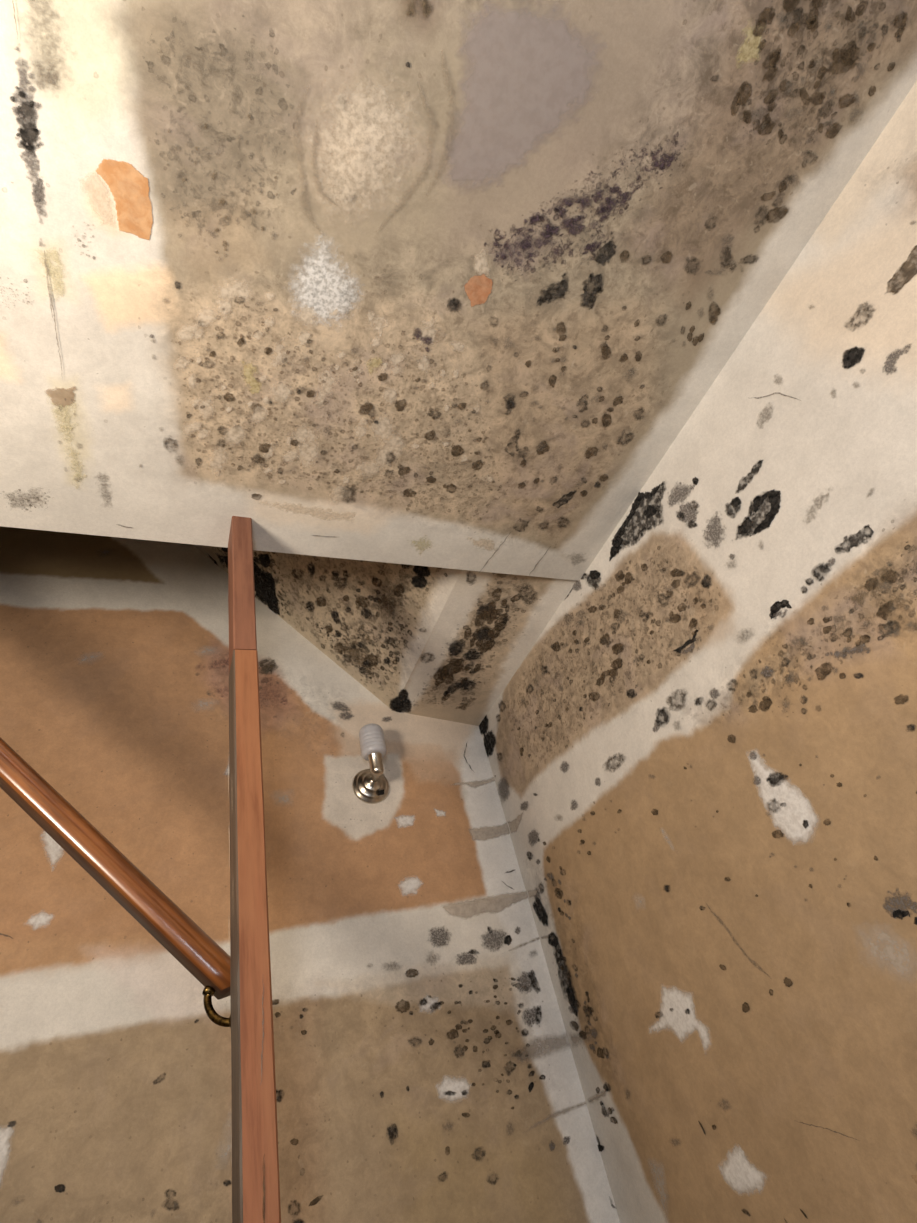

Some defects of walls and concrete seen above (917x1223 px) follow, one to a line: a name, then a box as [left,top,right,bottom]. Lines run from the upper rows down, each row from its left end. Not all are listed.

peeling [96,159,153,240]
leakage [484,132,681,310]
leakage [887,245,917,294]
leakage [176,242,501,519]
leakage [681,304,721,346]
leakage [842,347,865,369]
leakage [884,344,910,373]
leakage [802,525,873,593]
leakage [253,540,447,679]
leakage [421,575,536,710]
leakage [653,569,917,732]
leakage [384,689,411,722]